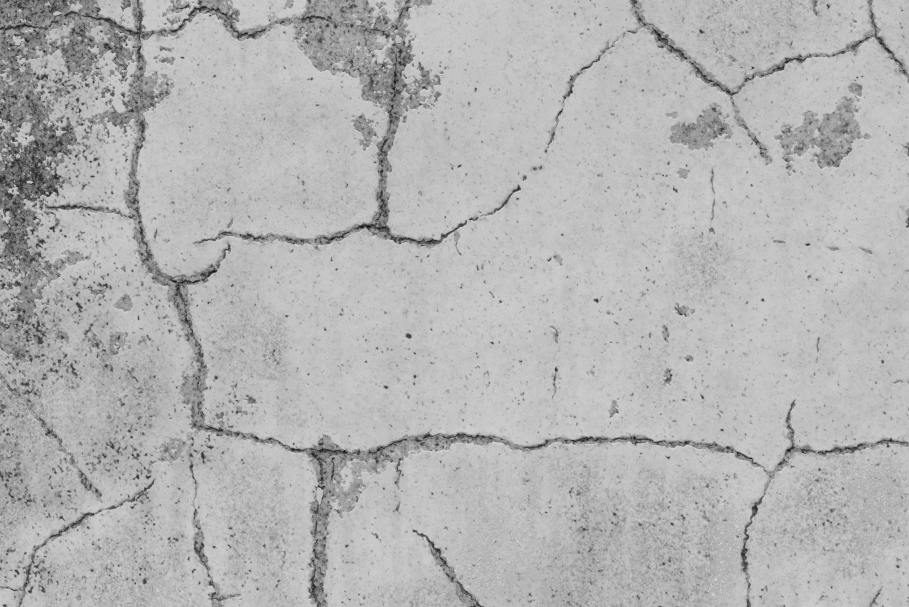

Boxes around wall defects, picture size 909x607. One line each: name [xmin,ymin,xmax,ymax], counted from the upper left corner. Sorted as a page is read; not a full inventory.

peeling [0,0,135,363]
peeling [142,47,176,113]
crack [0,0,467,446]
peeling [268,0,446,123]
peeling [351,114,383,151]
crack [481,185,521,217]
peeling [666,103,733,151]
crack [545,0,909,165]
peeling [775,84,871,176]
crack [0,372,156,607]
crack [189,450,242,607]
crack [201,400,909,607]